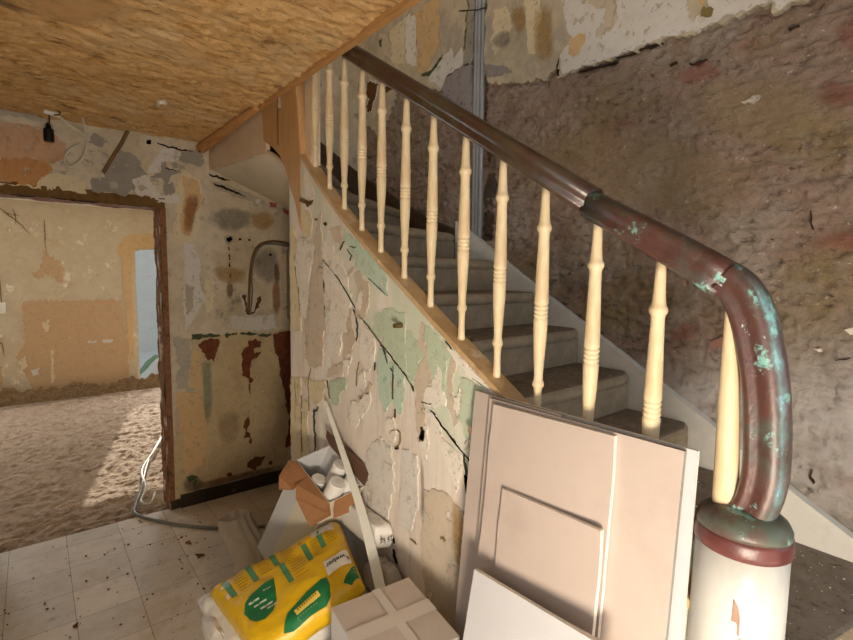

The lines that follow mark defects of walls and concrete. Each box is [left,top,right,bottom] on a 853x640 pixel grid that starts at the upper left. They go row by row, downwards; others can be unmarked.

peeling [698,0,714,18]
peeling [568,33,586,58]
flaking render [90,149,204,246]
crack [323,241,414,418]
peeling [430,323,493,393]
peeling [174,290,362,500]
crack [313,380,330,451]
peeling [385,365,420,533]
peeling [428,411,468,493]
crack [430,410,469,461]
peeling [732,600,742,640]